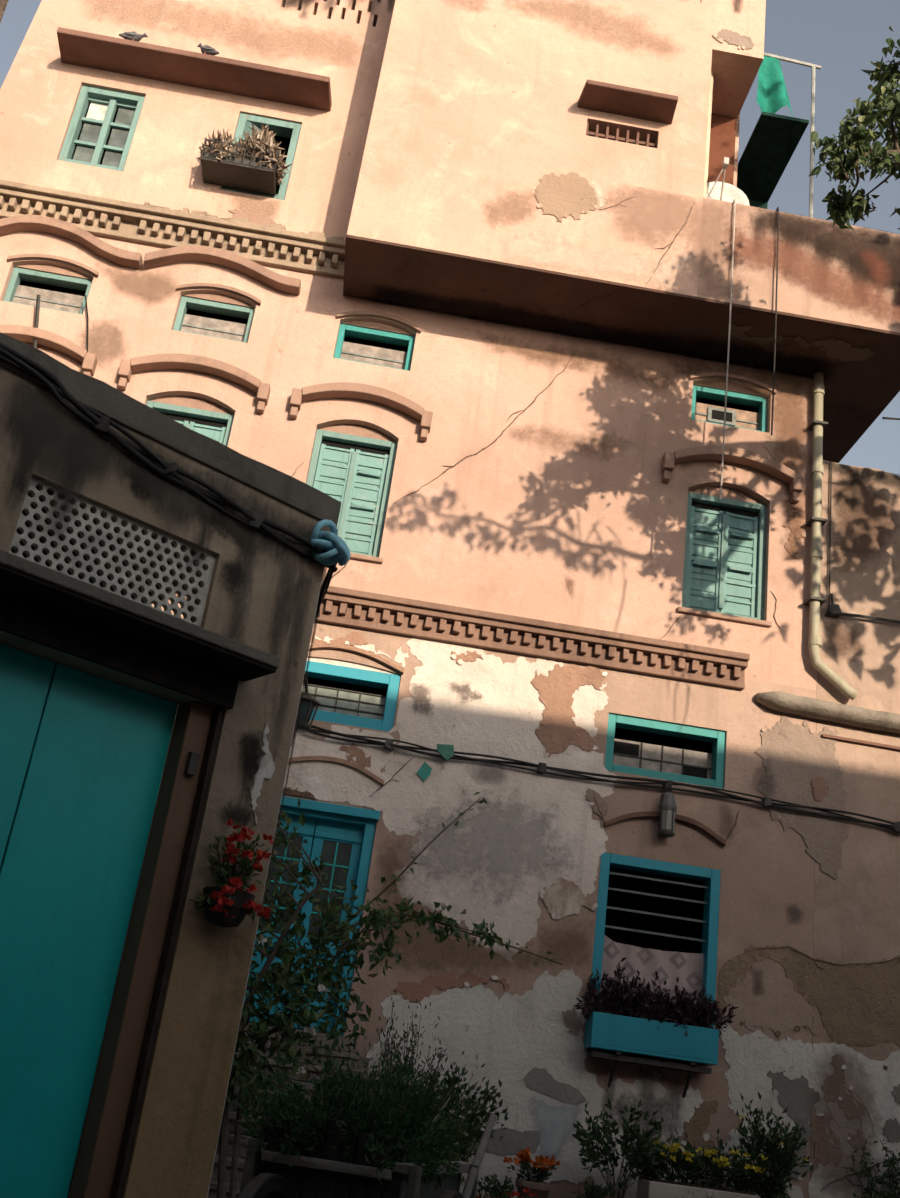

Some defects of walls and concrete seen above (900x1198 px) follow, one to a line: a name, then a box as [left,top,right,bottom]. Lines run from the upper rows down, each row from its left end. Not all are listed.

spalling [534,172,601,222]
crack [646,199,696,285]
water stain [505,187,900,323]
crack [395,350,578,503]
water stain [828,462,900,563]
water stain [9,381,327,759]
peeling [451,650,483,665]
peeling [530,664,607,758]
water stain [223,733,261,826]
spalling [249,722,275,826]
peeling [756,716,850,880]
peeling [717,945,900,1180]